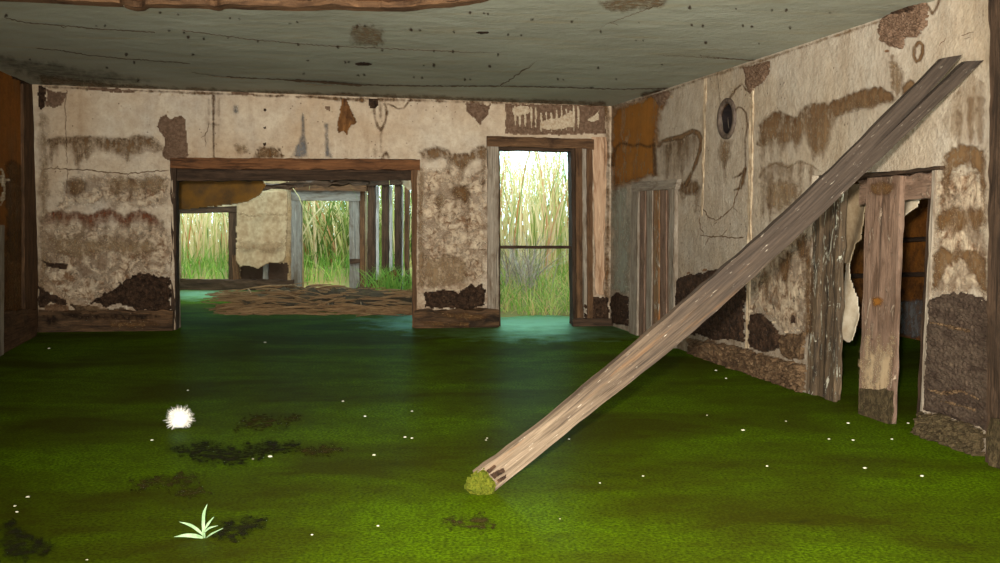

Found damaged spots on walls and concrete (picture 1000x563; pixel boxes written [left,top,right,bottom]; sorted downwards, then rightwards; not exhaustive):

flaking render [877,3,929,52]
water stain [39,117,160,287]
peeling [38,225,172,311]
flaking render [157,111,192,161]
water stain [10,60,703,195]
peeling [418,166,487,309]
flaking render [461,102,629,326]
crack [698,167,745,243]
flaking render [686,229,807,393]
water stain [721,55,915,153]
flaking render [900,171,988,456]
water stain [937,208,985,231]